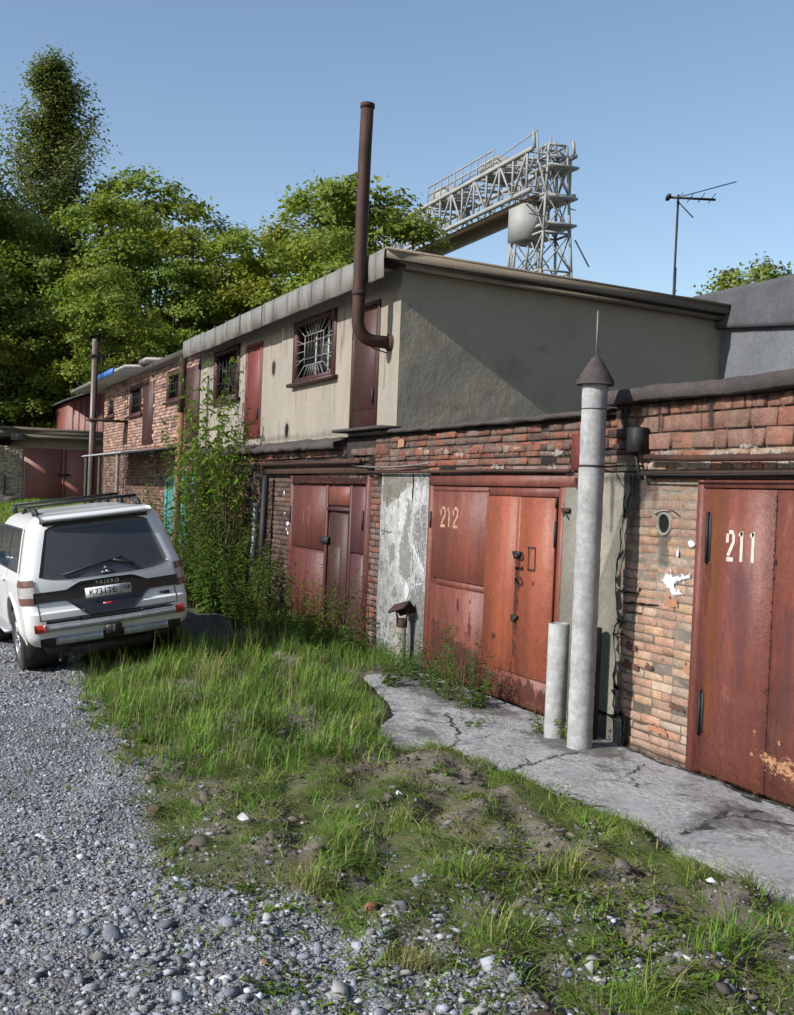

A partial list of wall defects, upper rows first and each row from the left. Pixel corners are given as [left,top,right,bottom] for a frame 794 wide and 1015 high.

damp [382,473,429,505]
rust [427,599,546,714]
rust [512,558,520,655]
crack [598,475,659,740]
peeling [661,569,690,608]
peeling [750,496,794,782]
crack [417,712,494,748]
crack [509,752,645,819]
damp [617,743,794,811]